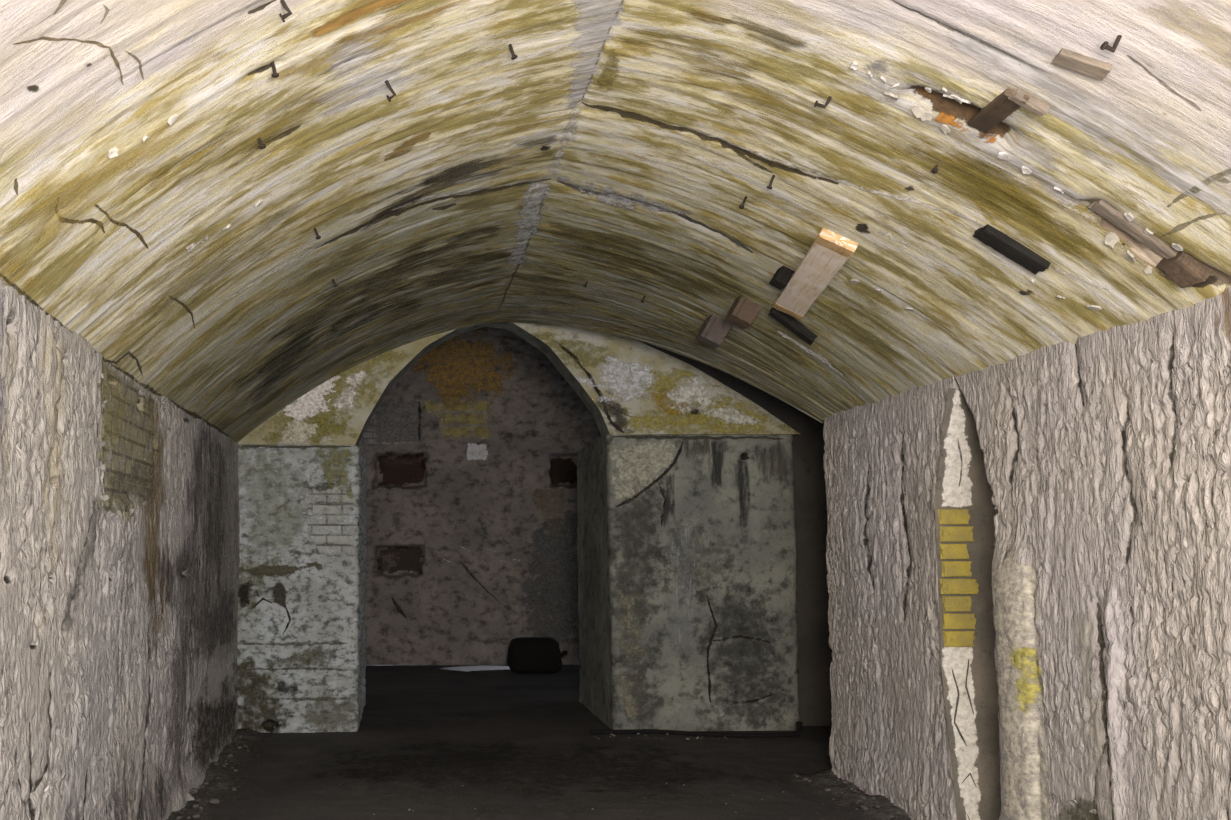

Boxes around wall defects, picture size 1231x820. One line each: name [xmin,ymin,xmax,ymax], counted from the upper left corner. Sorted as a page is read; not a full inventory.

crack [13,36,144,85]
crack [581,0,977,221]
spalling [850,61,1032,174]
crack [36,197,148,249]
water stain [235,284,420,403]
crack [557,342,784,526]
water stain [159,423,356,789]
water stain [608,437,799,731]